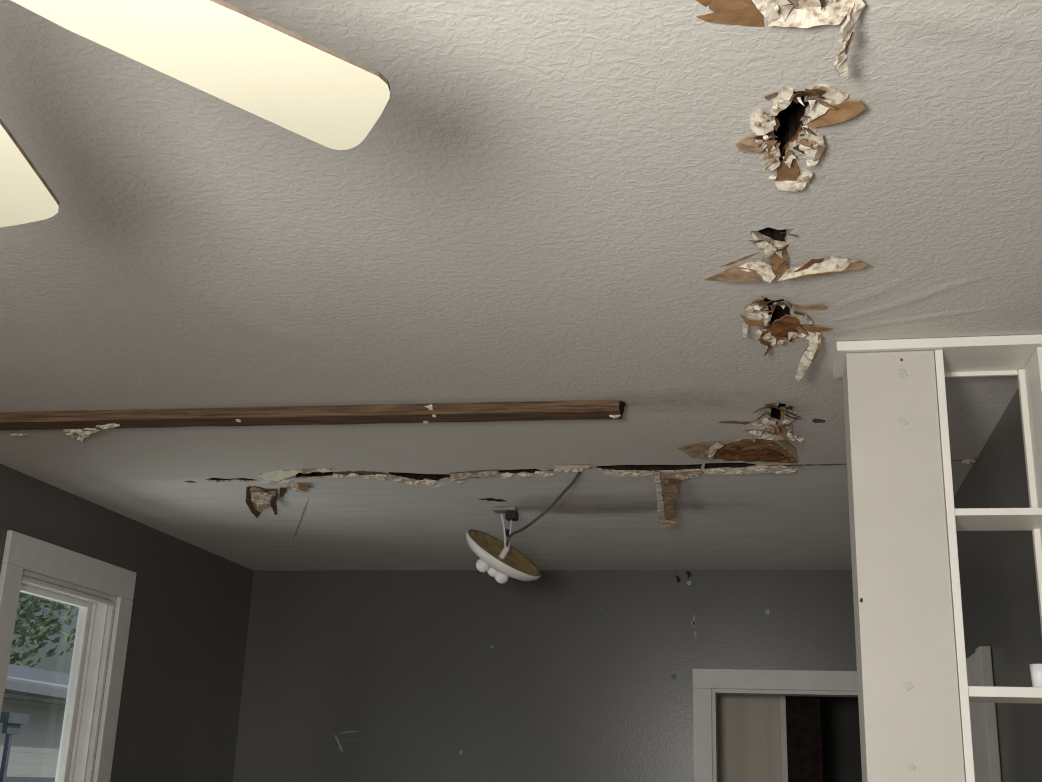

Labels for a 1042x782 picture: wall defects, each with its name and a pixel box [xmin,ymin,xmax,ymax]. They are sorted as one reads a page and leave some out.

peeling [752,0,852,28]
spalling [749,84,848,192]
spalling [739,227,793,282]
spalling [744,297,816,346]
peeling [757,403,800,441]
peeling [708,441,724,460]
crack [951,457,977,465]
crack [185,463,847,538]